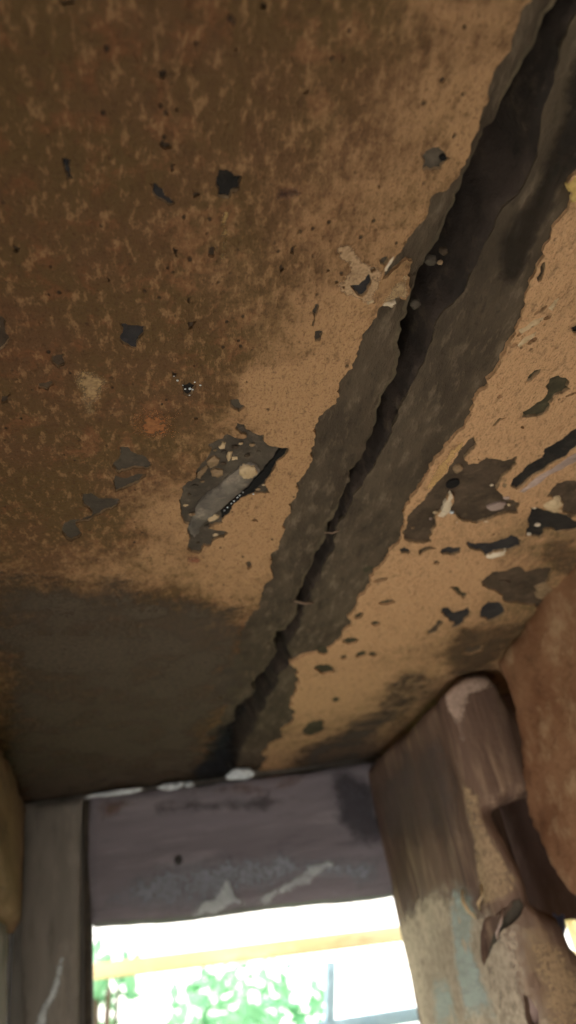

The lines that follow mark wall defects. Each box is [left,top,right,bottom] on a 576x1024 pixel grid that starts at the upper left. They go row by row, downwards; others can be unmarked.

spalling [179,0,576,771]
crack [216,0,576,772]